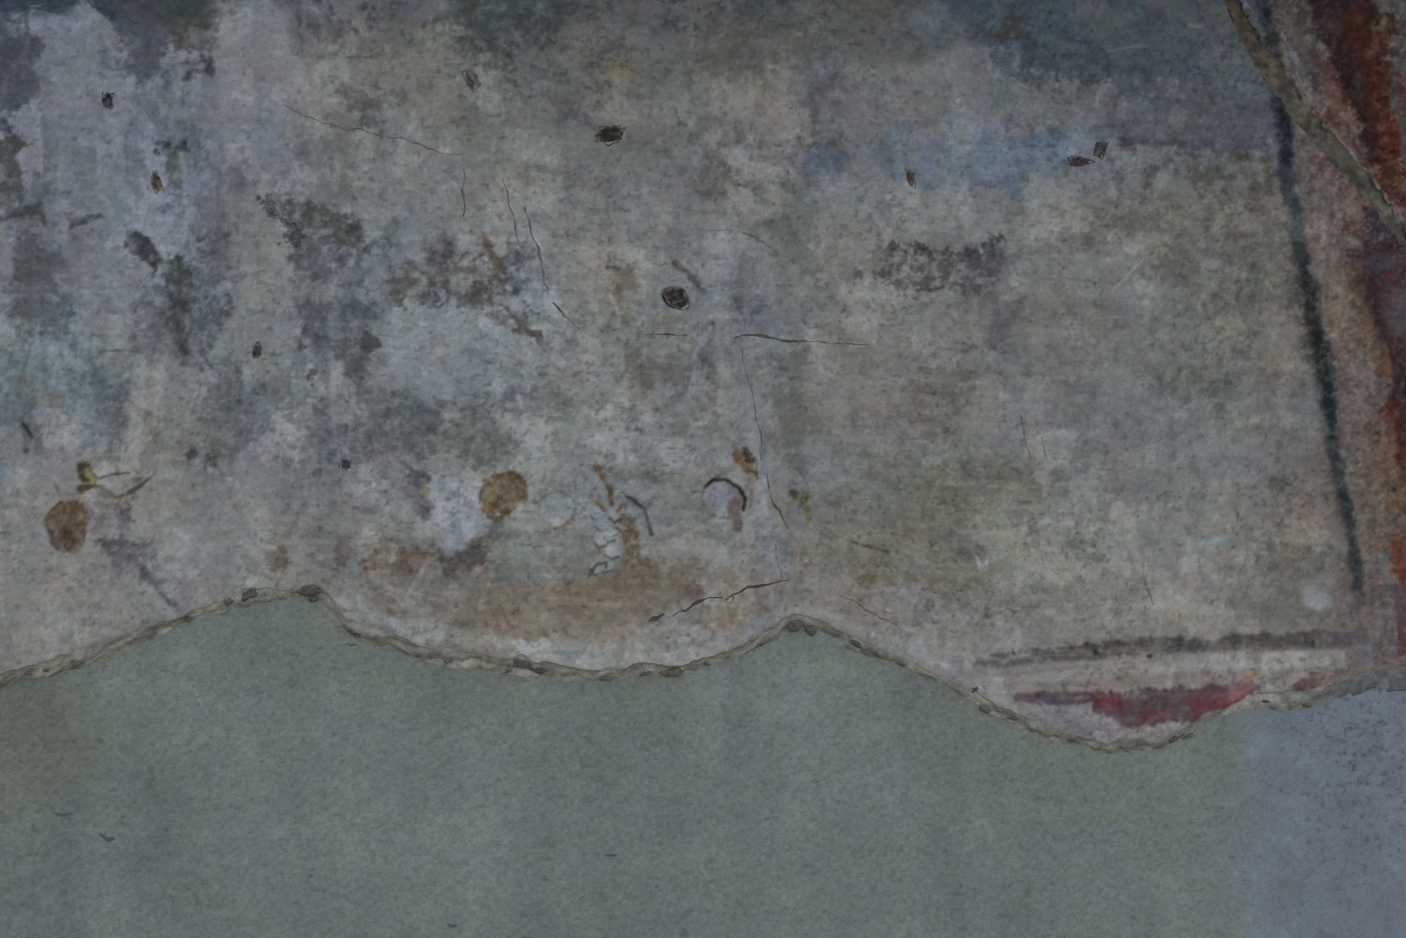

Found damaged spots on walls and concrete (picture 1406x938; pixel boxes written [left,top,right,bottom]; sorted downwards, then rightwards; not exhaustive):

crack [1224,0,1406,250]
crack [648,334,869,622]
spalling [0,581,1406,754]